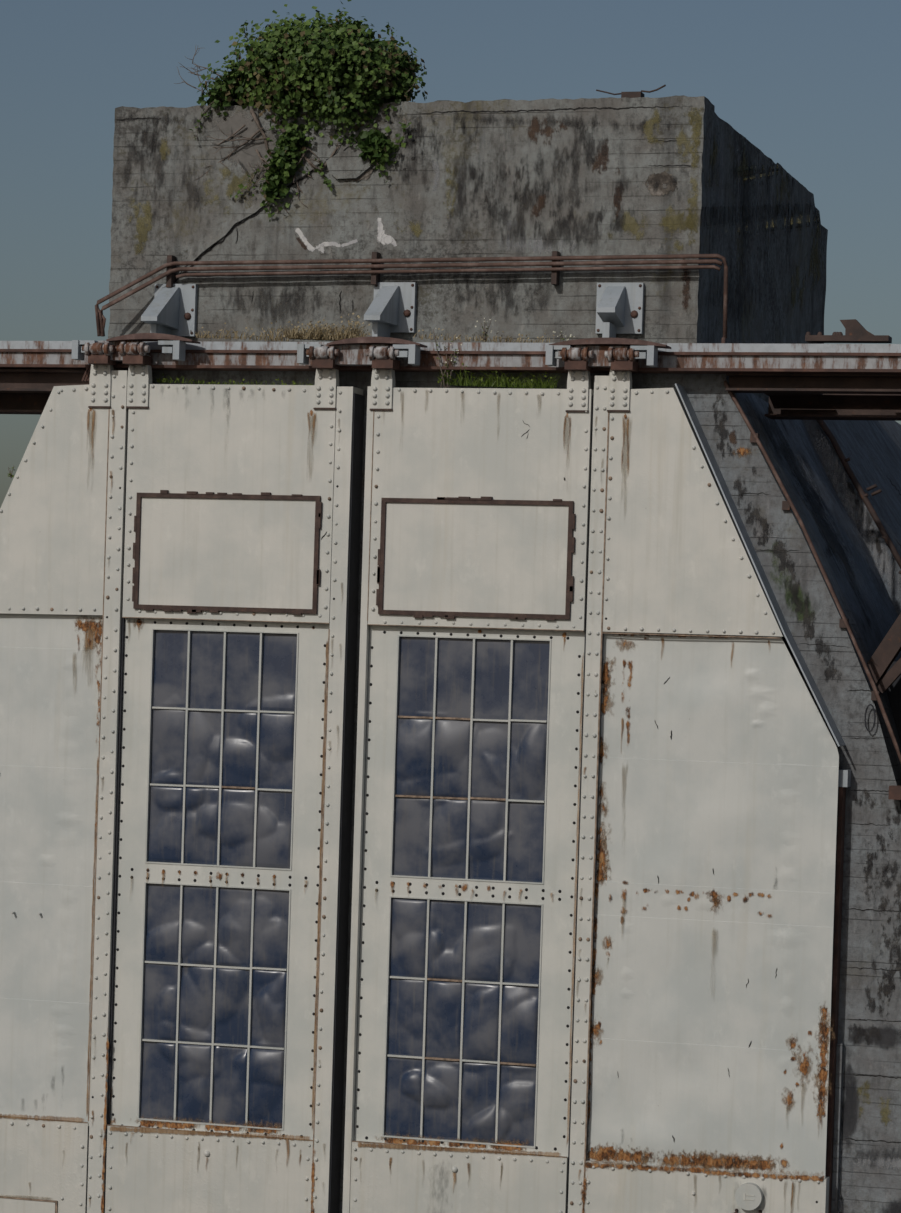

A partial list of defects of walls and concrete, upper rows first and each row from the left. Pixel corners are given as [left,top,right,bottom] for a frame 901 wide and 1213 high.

crack [175,142,357,282]
damp [492,119,601,242]
mould [713,395,732,457]
mould [734,479,837,680]
corrosion [601,633,753,743]
corrosion [305,643,328,1118]
corrosion [358,655,586,1188]
corrosion [588,787,628,1131]
damp [849,835,901,1049]
corrosion [0,1020,315,1213]
corrosion [578,1144,824,1213]
damp [841,1066,858,1145]